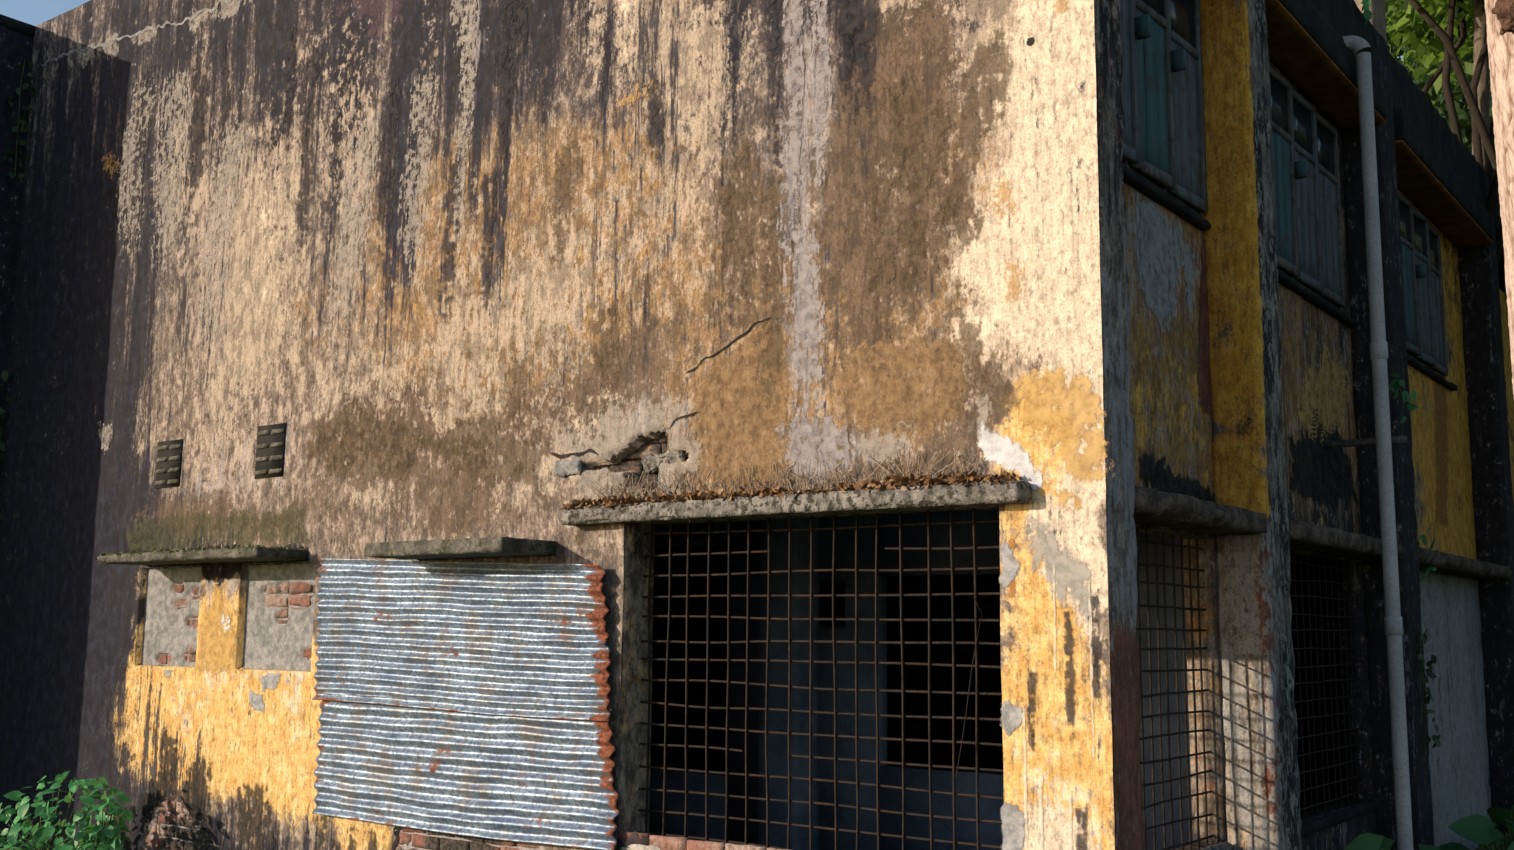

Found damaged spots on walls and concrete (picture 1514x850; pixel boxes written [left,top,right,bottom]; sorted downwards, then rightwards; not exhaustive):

damp [185,40,232,201]
damp [282,26,323,246]
damp [710,0,1011,488]
damp [305,351,550,492]
flaking render [554,321,790,493]
damp [950,307,1043,490]
peeling [157,577,244,678]
peeling [249,670,291,712]
flaking render [263,582,315,624]
flaking render [999,542,1020,588]
flaking render [1000,701,1022,736]
damp [141,730,213,850]